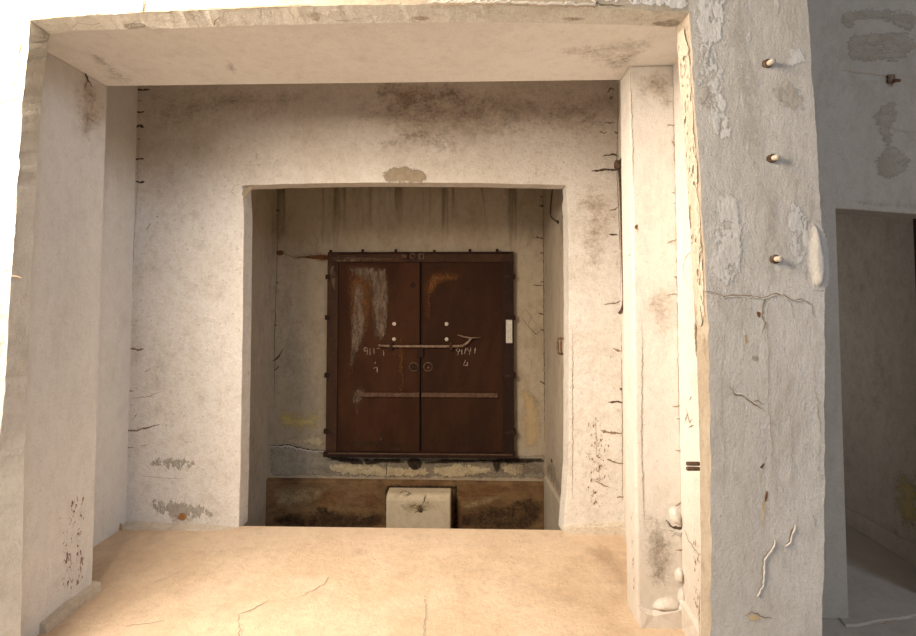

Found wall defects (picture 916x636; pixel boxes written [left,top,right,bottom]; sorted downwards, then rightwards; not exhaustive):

peeling [842,9,916,62]
peeling [776,47,808,110]
flaking render [0,97,22,272]
peeling [589,0,744,352]
peeling [874,102,910,179]
peeling [787,202,810,264]
crack [667,231,814,497]
crack [756,514,816,597]
crack [238,600,269,636]
crack [421,598,429,636]